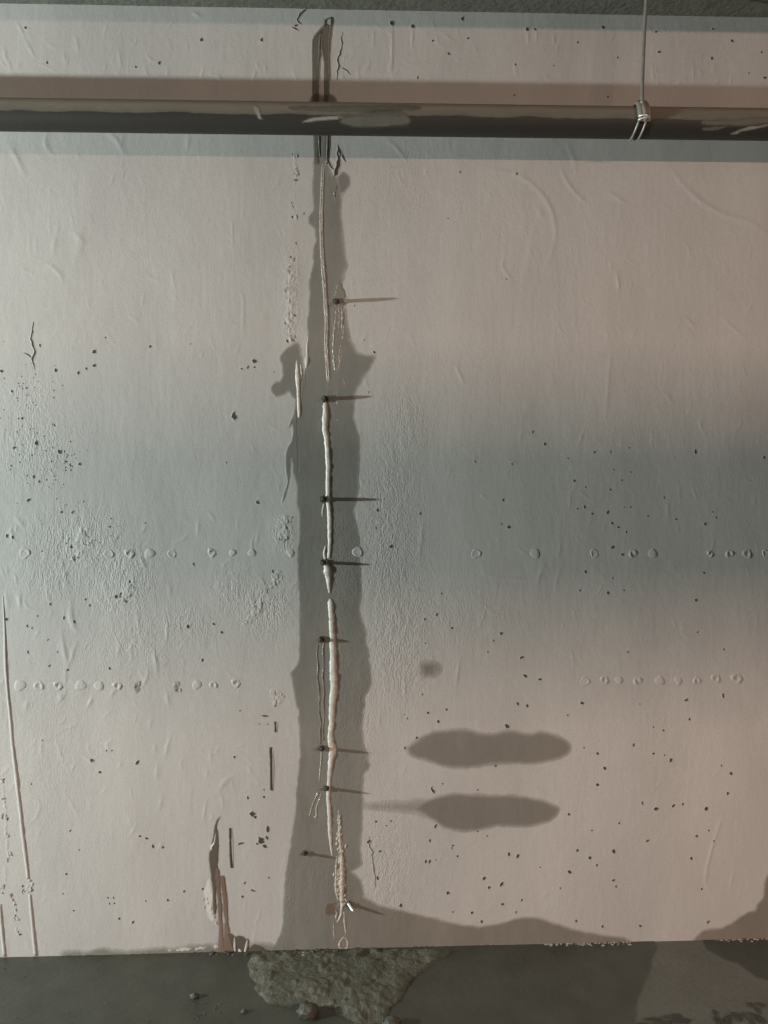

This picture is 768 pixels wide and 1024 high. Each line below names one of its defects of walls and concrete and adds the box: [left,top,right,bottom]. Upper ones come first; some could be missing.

crack [291,9,306,31]
crack [336,34,350,80]
crack [24,322,36,370]
crack [319,145,346,863]
peeling [203,878,219,927]